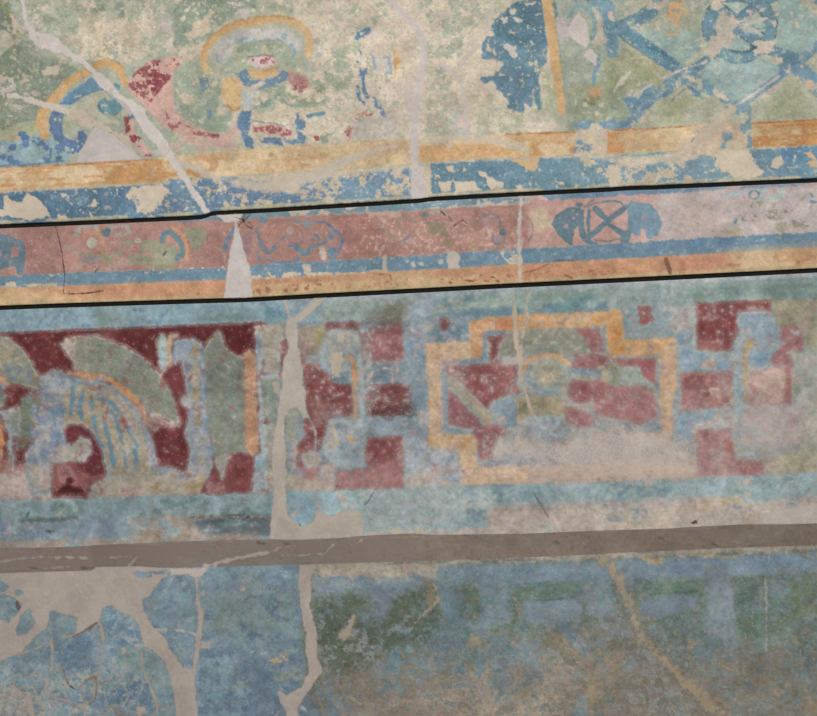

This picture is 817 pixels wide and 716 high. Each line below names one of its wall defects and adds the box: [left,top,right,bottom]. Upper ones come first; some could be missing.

flaking render [555,11,598,66]
crack [0,0,533,225]
peeling [0,192,67,221]
peeling [126,183,169,212]
peeling [434,165,504,194]
peeling [608,164,622,188]
peeling [714,148,784,181]
crack [55,226,103,295]
crack [155,297,374,716]
crack [0,619,125,716]
flaking render [0,565,208,716]
crack [140,650,169,716]